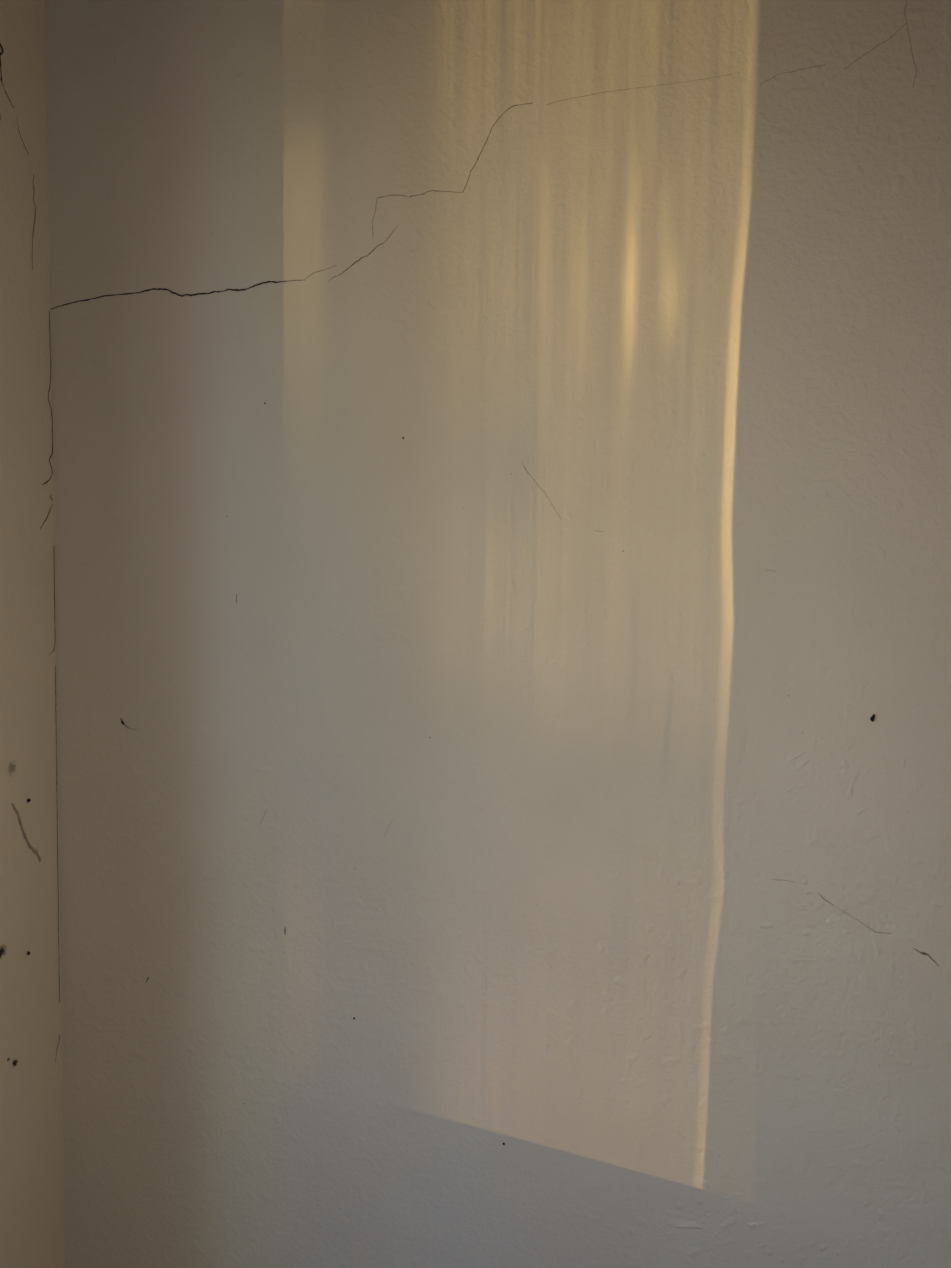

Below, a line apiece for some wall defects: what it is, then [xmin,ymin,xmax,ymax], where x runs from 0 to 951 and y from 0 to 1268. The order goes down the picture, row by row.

crack [40,102,533,694]